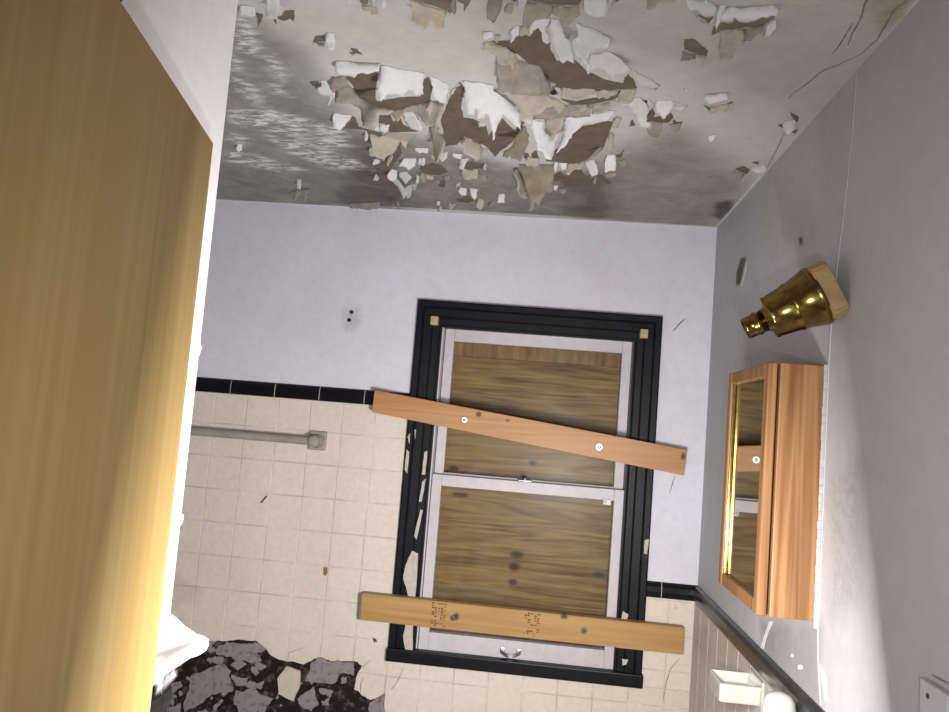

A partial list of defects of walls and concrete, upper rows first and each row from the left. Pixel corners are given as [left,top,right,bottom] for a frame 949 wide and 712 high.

peeling [647,0,780,66]
crack [789,0,907,98]
leakage [217,15,391,206]
peeling [310,0,689,212]
peeling [704,92,734,113]
peeling [403,451,427,596]
peeling [403,625,413,650]